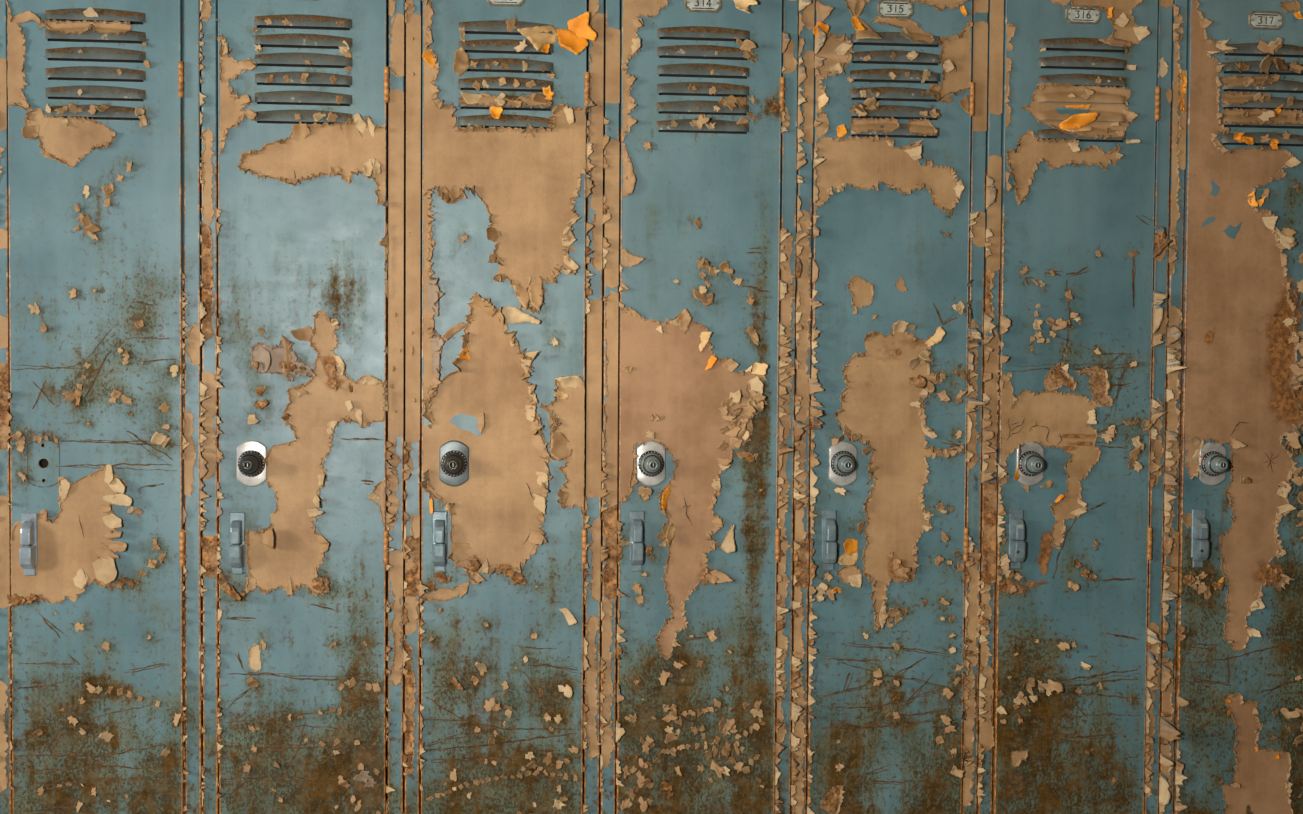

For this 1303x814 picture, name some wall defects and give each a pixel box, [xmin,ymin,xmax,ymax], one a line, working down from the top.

peeling [0,0,132,174]
peeling [135,107,147,127]
peeling [74,161,132,241]
peeling [28,302,47,333]
peeling [61,362,91,408]
peeling [108,389,133,415]
peeling [151,402,171,448]
peeling [170,0,768,814]
peeling [769,0,1303,814]
peeling [0,464,167,653]
peeling [60,682,160,742]
peeling [160,553,222,814]